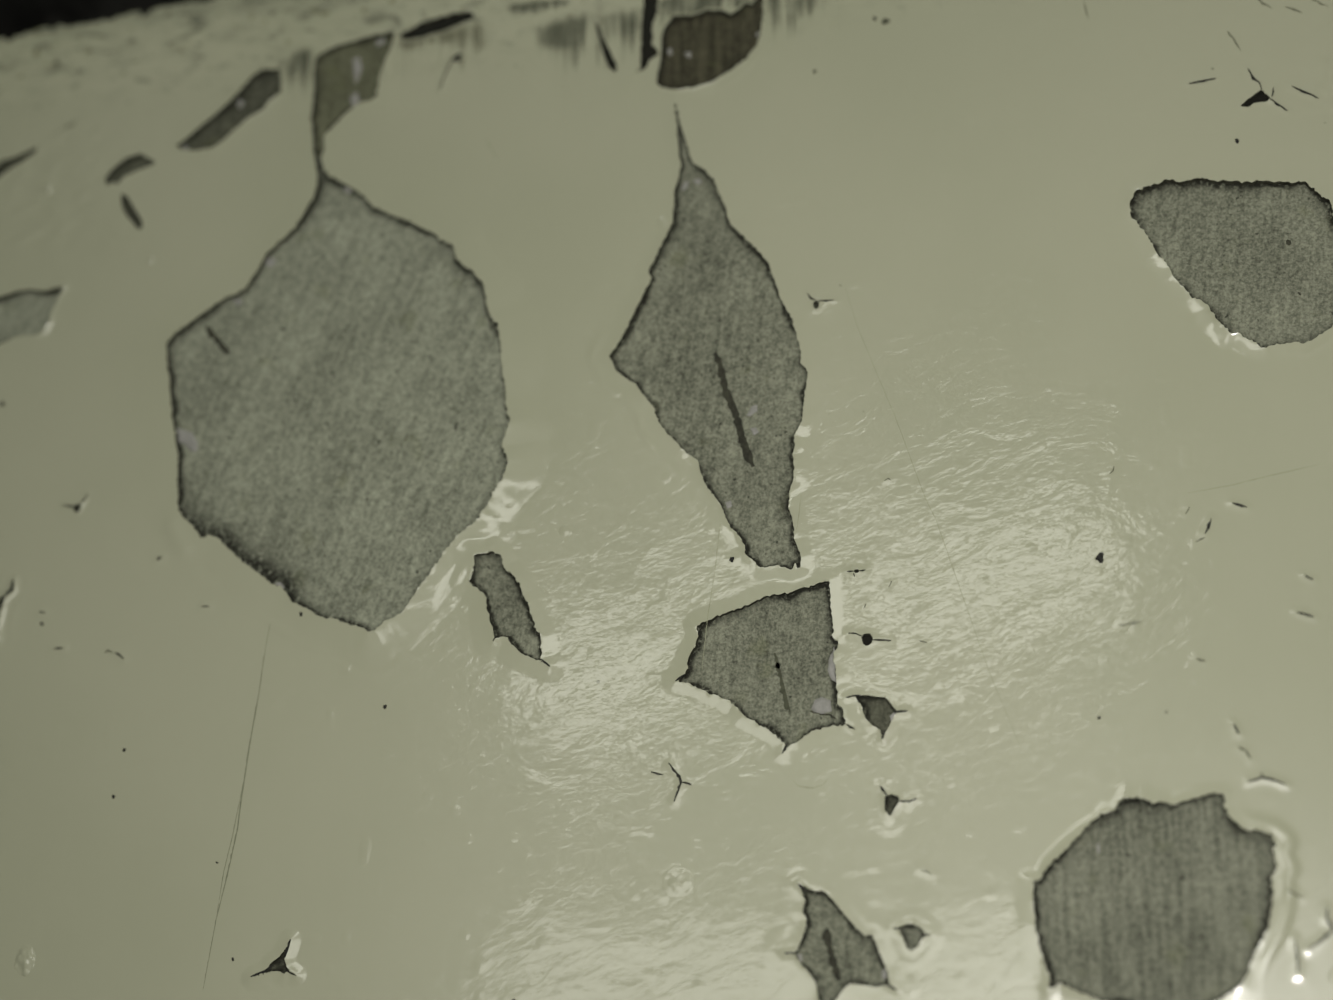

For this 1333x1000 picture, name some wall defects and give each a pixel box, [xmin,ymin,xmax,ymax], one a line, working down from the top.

peeling [0,286,63,344]
peeling [166,11,510,632]
peeling [609,0,808,570]
peeling [1130,178,1333,348]
peeling [469,551,550,667]
peeling [675,581,907,754]
peeling [250,939,296,977]
peeling [784,883,897,1000]
peeling [1033,793,1277,1000]